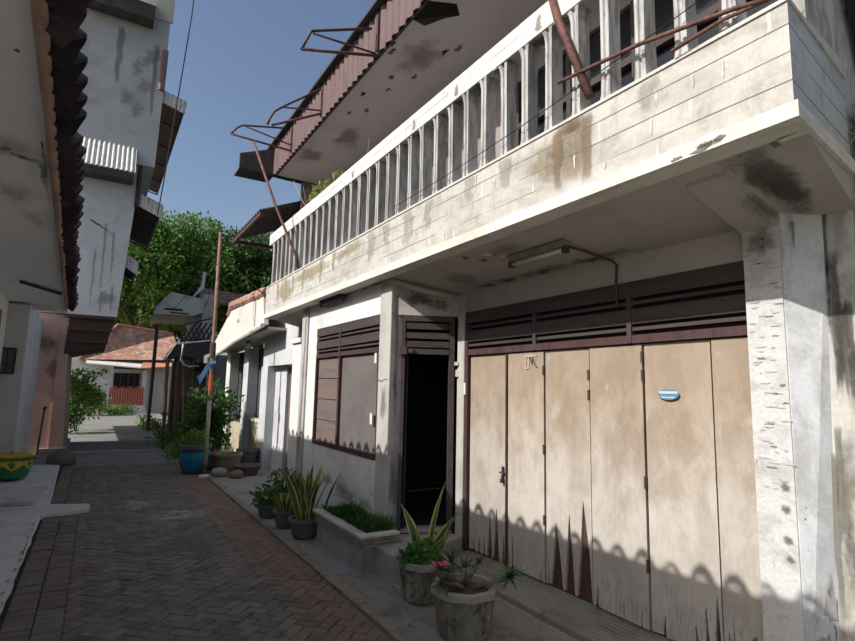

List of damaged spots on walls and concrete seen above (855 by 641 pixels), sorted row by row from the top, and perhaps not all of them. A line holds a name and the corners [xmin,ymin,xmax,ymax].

damp [115,29,125,80]
damp [121,49,159,115]
crack [38,142,50,199]
spalling [671,134,726,162]
damp [821,214,855,394]
damp [831,431,855,589]
flaking render [817,574,838,641]